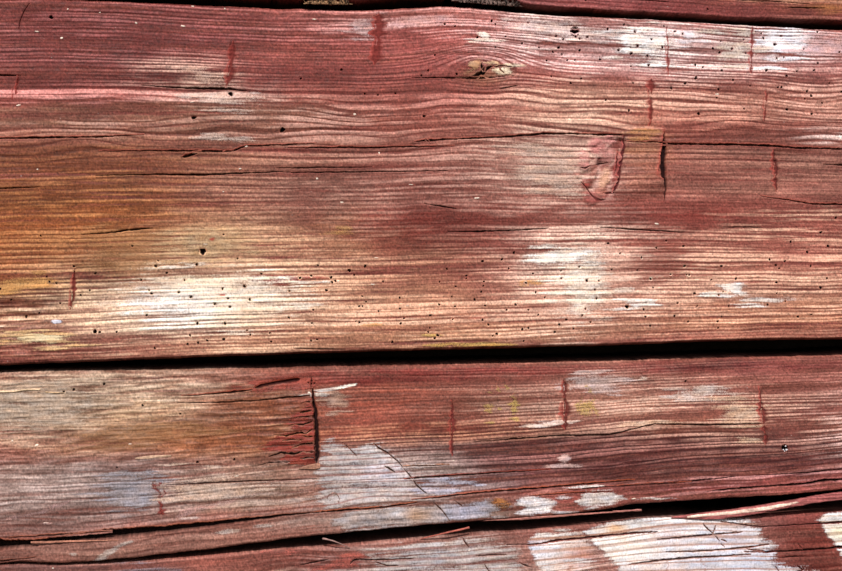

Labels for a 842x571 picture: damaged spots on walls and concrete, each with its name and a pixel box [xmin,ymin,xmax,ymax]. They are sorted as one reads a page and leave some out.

peeling [523,420,577,428]
crack [472,422,761,444]
peeling [546,454,582,468]
peeling [75,463,274,514]
peeling [314,438,505,531]
crack [0,442,842,563]
peeling [510,484,624,514]
crack [300,558,329,566]
crack [350,558,414,567]
peeling [365,517,801,571]
crack [461,521,842,571]
peeling [819,512,842,555]